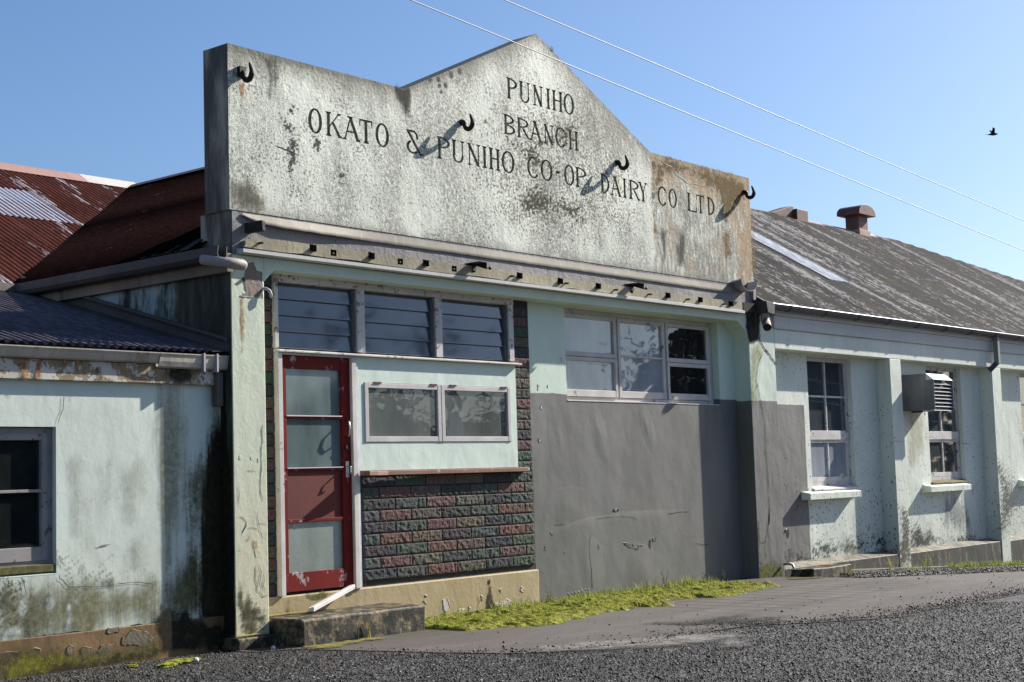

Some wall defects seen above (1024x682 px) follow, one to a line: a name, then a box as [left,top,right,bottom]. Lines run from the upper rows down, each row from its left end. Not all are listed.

leakage [279,103,324,177]
leakage [663,232,685,263]
leakage [996,458,1024,538]
leakage [21,392,235,677]
leakage [785,522,886,562]
leakage [899,500,976,567]
peeling [442,597,472,613]